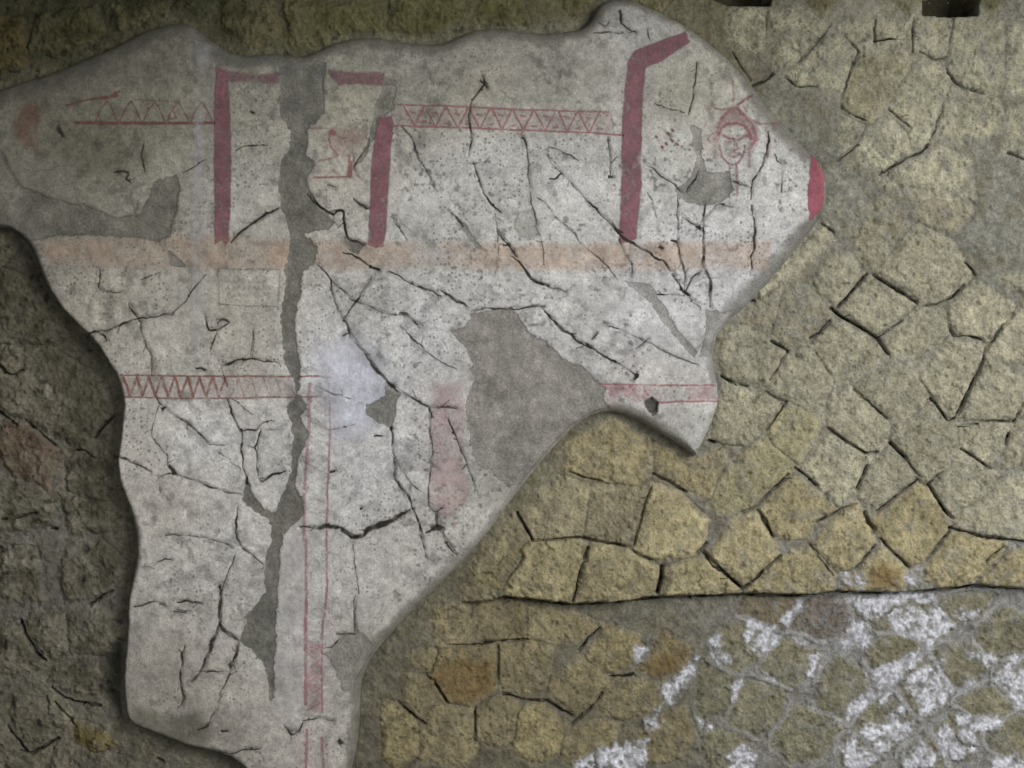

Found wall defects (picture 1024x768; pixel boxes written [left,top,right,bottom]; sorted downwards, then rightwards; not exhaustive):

spalling [0,150,181,241]
crack [307,75,698,380]
crack [1,269,285,754]
spalling [240,60,335,700]
spalling [366,382,401,427]
crack [300,354,474,648]
spalling [450,307,610,485]
water stain [575,718,657,768]
crack [503,431,1022,650]
water stain [743,601,802,652]
water stain [842,572,1003,768]
water stain [971,652,1024,708]